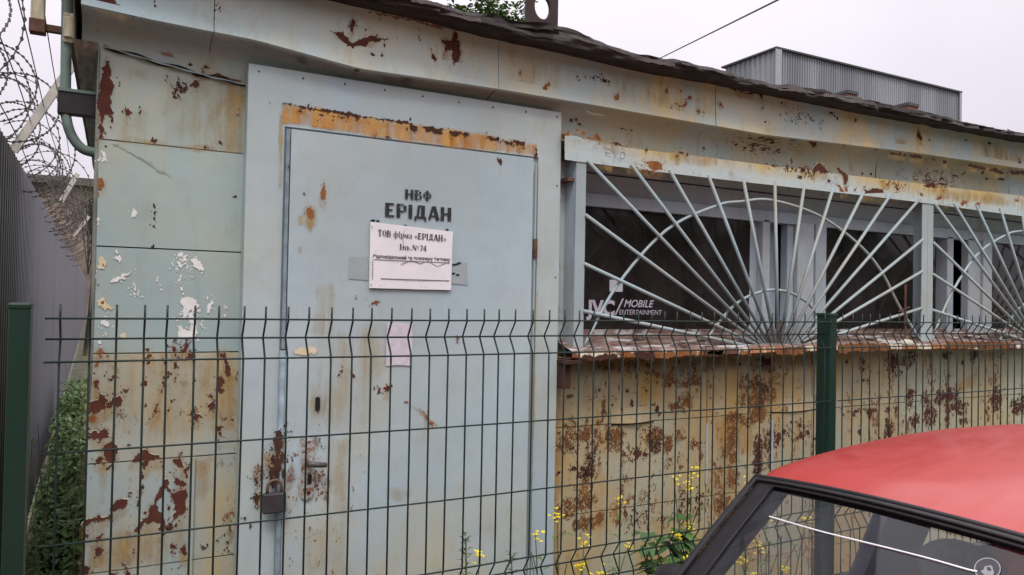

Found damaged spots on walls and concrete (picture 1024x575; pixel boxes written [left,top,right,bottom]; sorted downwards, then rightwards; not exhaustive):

corrosion [279,102,538,165]
corrosion [729,88,1024,208]
peeling [95,250,143,348]
peeling [169,250,214,341]
corrosion [79,339,238,575]
corrosion [221,422,301,554]
corrosion [308,424,354,542]
corrosion [554,346,816,534]
corrosion [838,340,969,438]
corrosion [941,340,1013,365]
corrosion [986,386,1024,415]